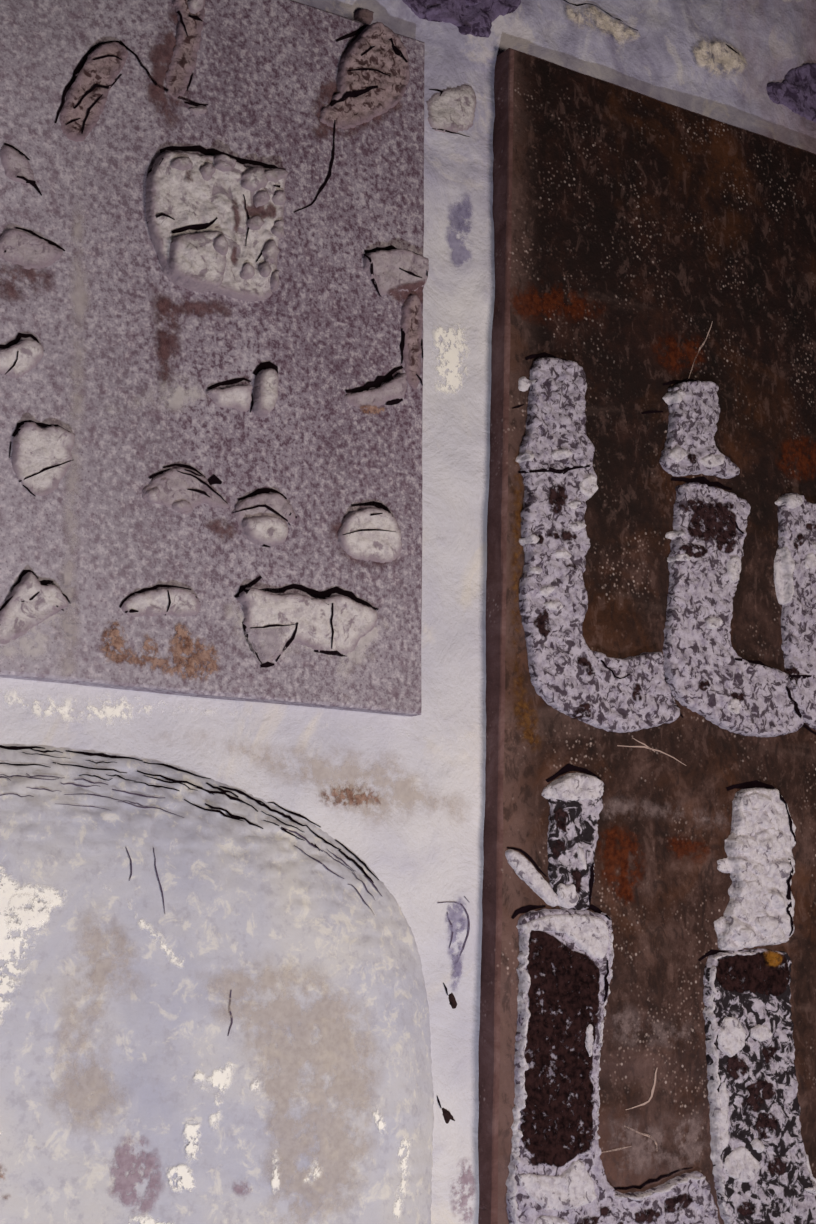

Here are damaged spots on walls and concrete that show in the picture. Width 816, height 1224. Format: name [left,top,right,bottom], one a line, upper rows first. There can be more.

spalling [55,0,208,142]
crack [294,120,336,213]
spalling [145,145,288,301]
spalling [9,420,75,497]
spalling [337,501,402,563]
spalling [665,500,741,584]
peeling [774,523,816,605]
corrosion [101,622,218,680]
spalling [234,576,379,668]
crack [0,745,382,914]
spalling [516,772,693,1224]
peeling [716,1017,788,1182]